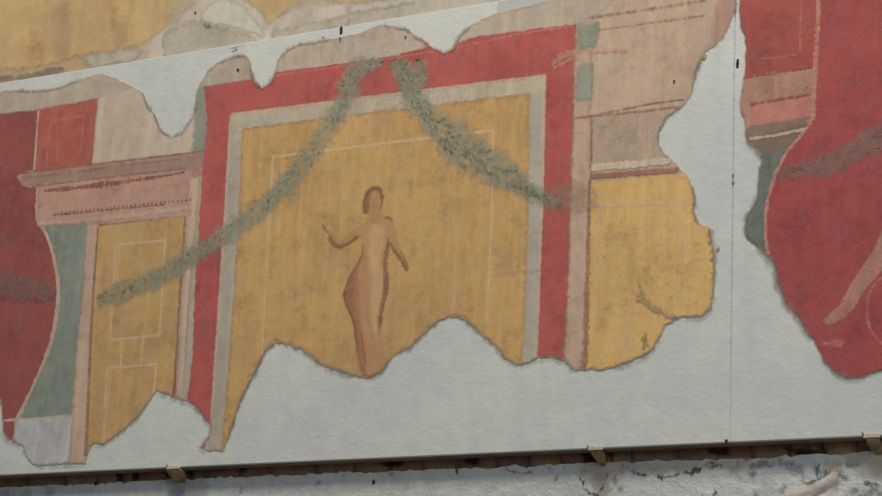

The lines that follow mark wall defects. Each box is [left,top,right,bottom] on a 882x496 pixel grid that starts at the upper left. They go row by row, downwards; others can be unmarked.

flaking render [0,0,552,137]
flaking render [605,441,872,463]
flaking render [0,472,172,488]
flaking render [185,453,597,480]
crack [635,462,722,496]
crack [801,463,826,484]